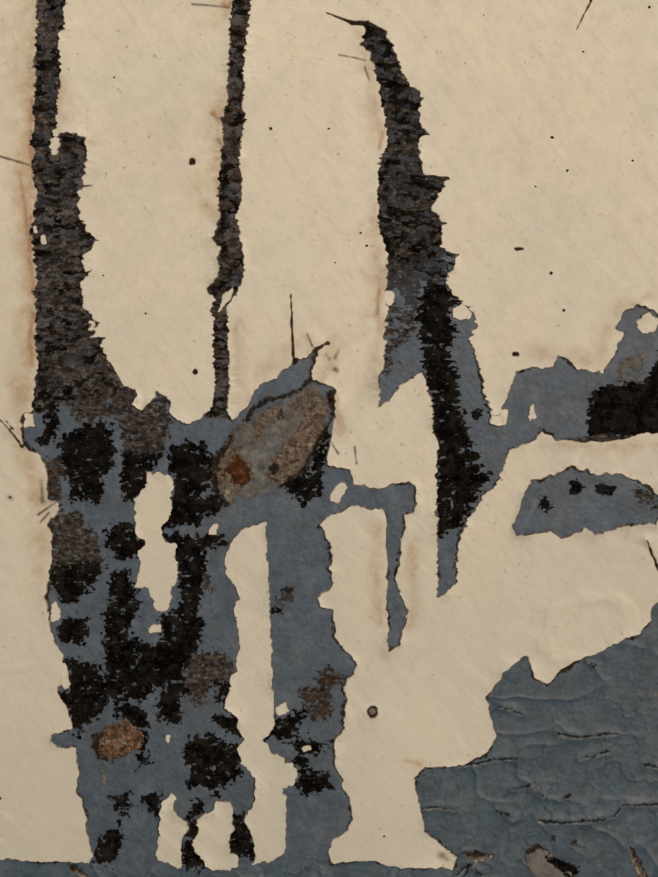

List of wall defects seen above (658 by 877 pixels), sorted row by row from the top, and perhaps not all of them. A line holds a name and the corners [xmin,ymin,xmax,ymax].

peeling [29,0,120,411]
peeling [203,0,251,420]
peeling [360,23,658,596]
peeling [0,342,658,877]